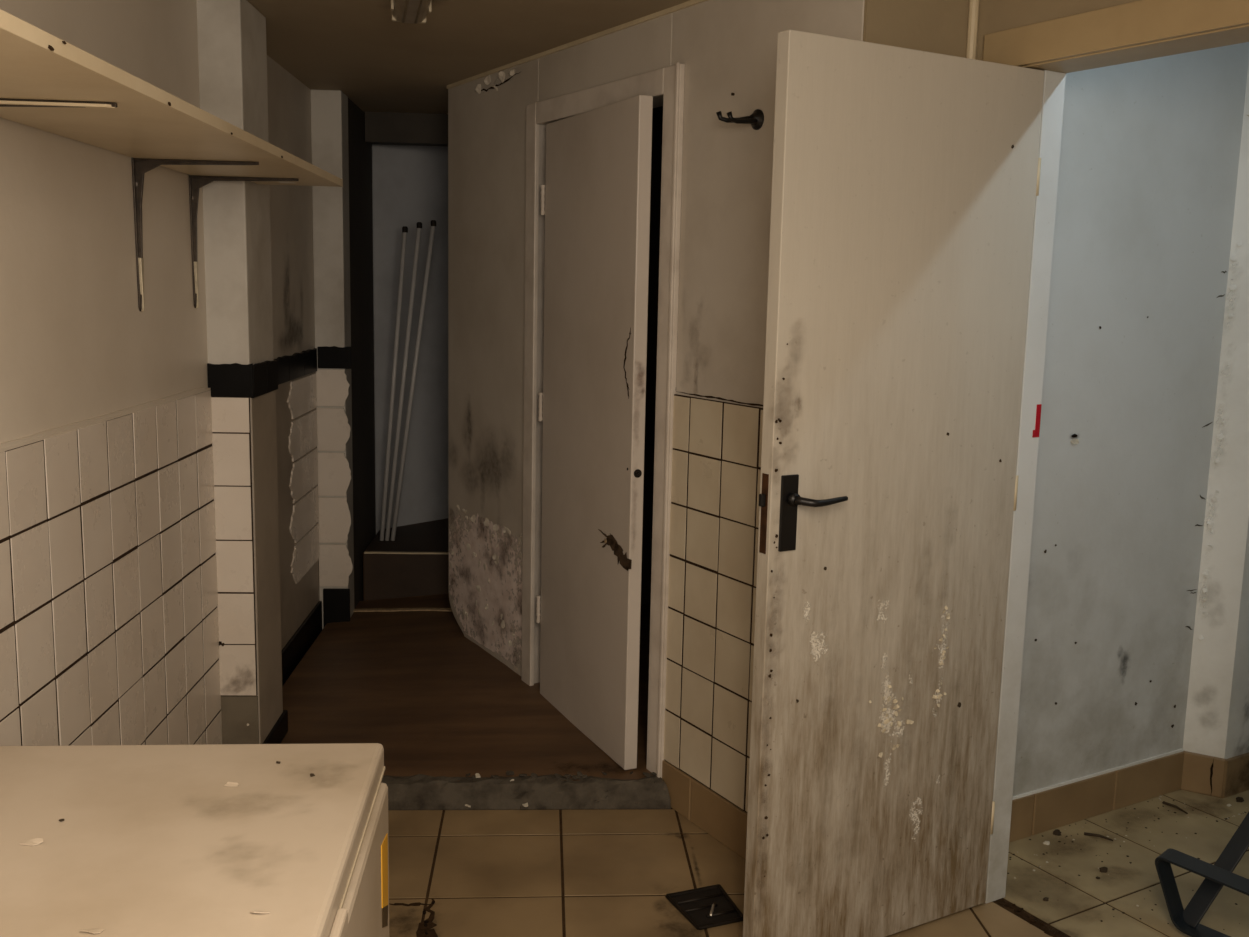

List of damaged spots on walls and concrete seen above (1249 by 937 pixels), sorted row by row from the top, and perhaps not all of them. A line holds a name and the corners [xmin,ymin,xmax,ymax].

crack [389,898,438,937]